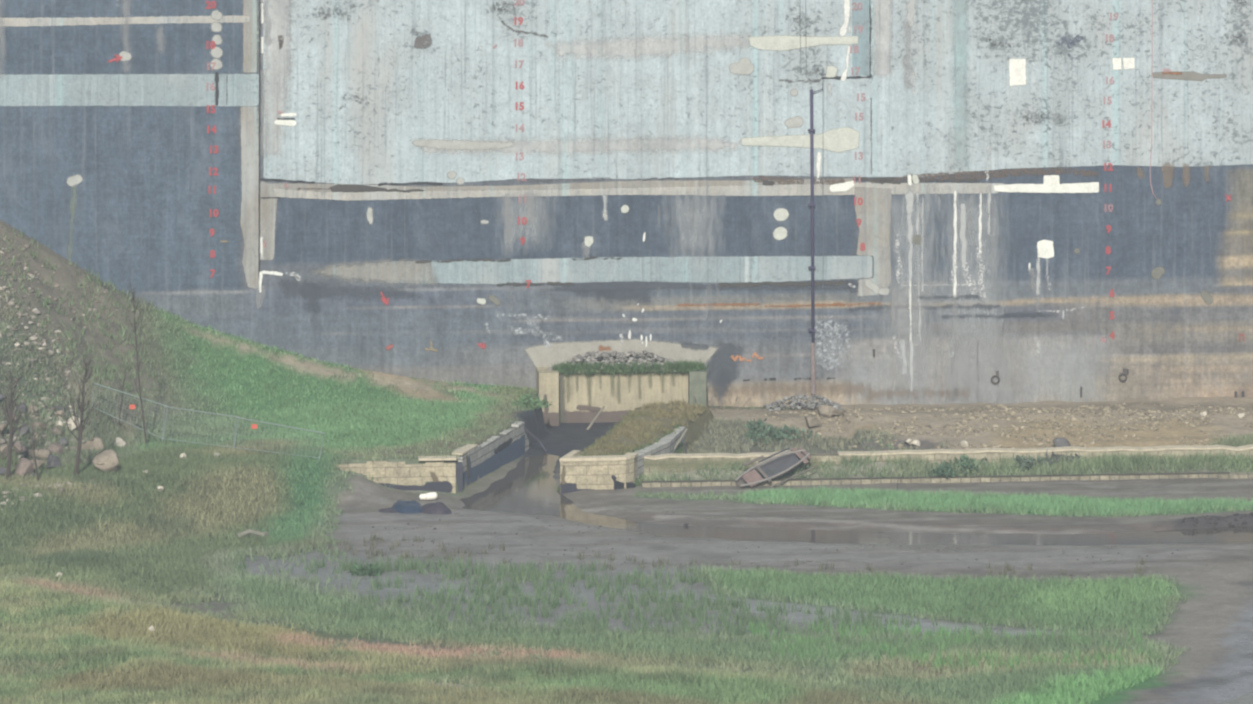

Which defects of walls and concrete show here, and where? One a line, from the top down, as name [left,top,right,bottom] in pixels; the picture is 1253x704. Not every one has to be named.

damp [486,146,1084,426]